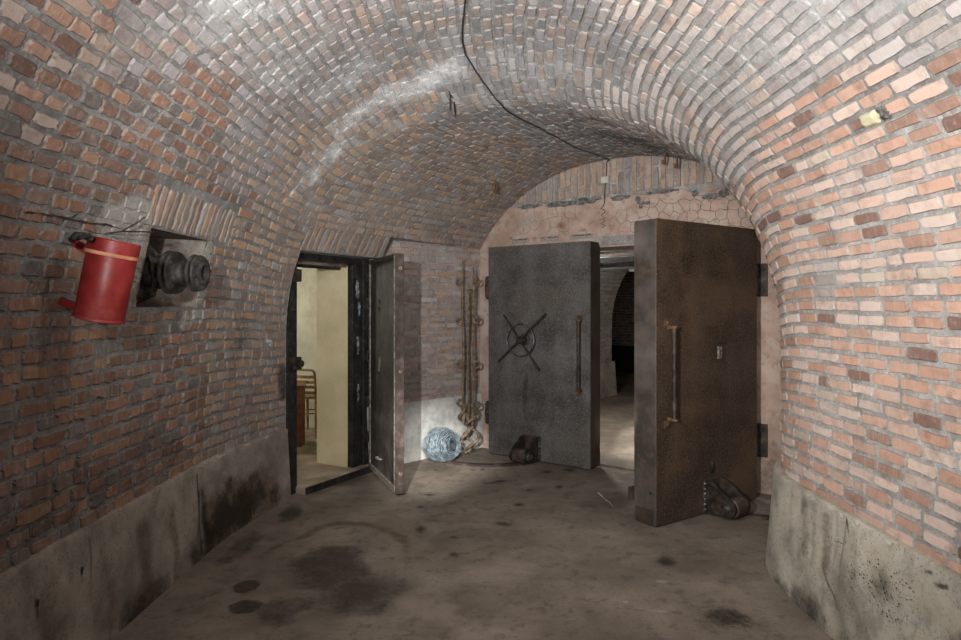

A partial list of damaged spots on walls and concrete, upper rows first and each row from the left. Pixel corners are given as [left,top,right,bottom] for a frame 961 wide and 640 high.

leakage [193,472,300,564]
leakage [126,568,167,625]
leakage [229,580,261,613]
crack [822,517,849,618]